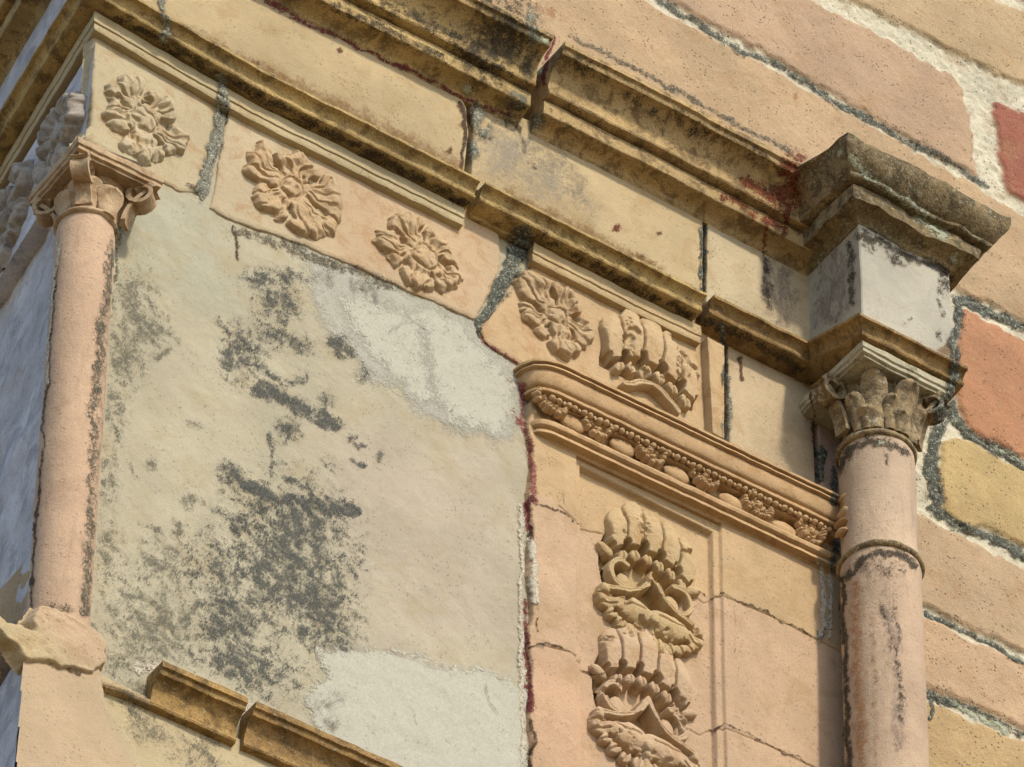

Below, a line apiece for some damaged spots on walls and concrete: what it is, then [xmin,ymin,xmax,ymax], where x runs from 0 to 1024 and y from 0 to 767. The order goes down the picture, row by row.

corrosion [719,147,807,249]
peeling [332,291,519,440]
mould [79,224,401,767]
crack [476,330,605,767]
crack [701,592,827,645]
mould [836,434,911,479]
leakage [840,546,919,583]
leakage [874,599,906,721]